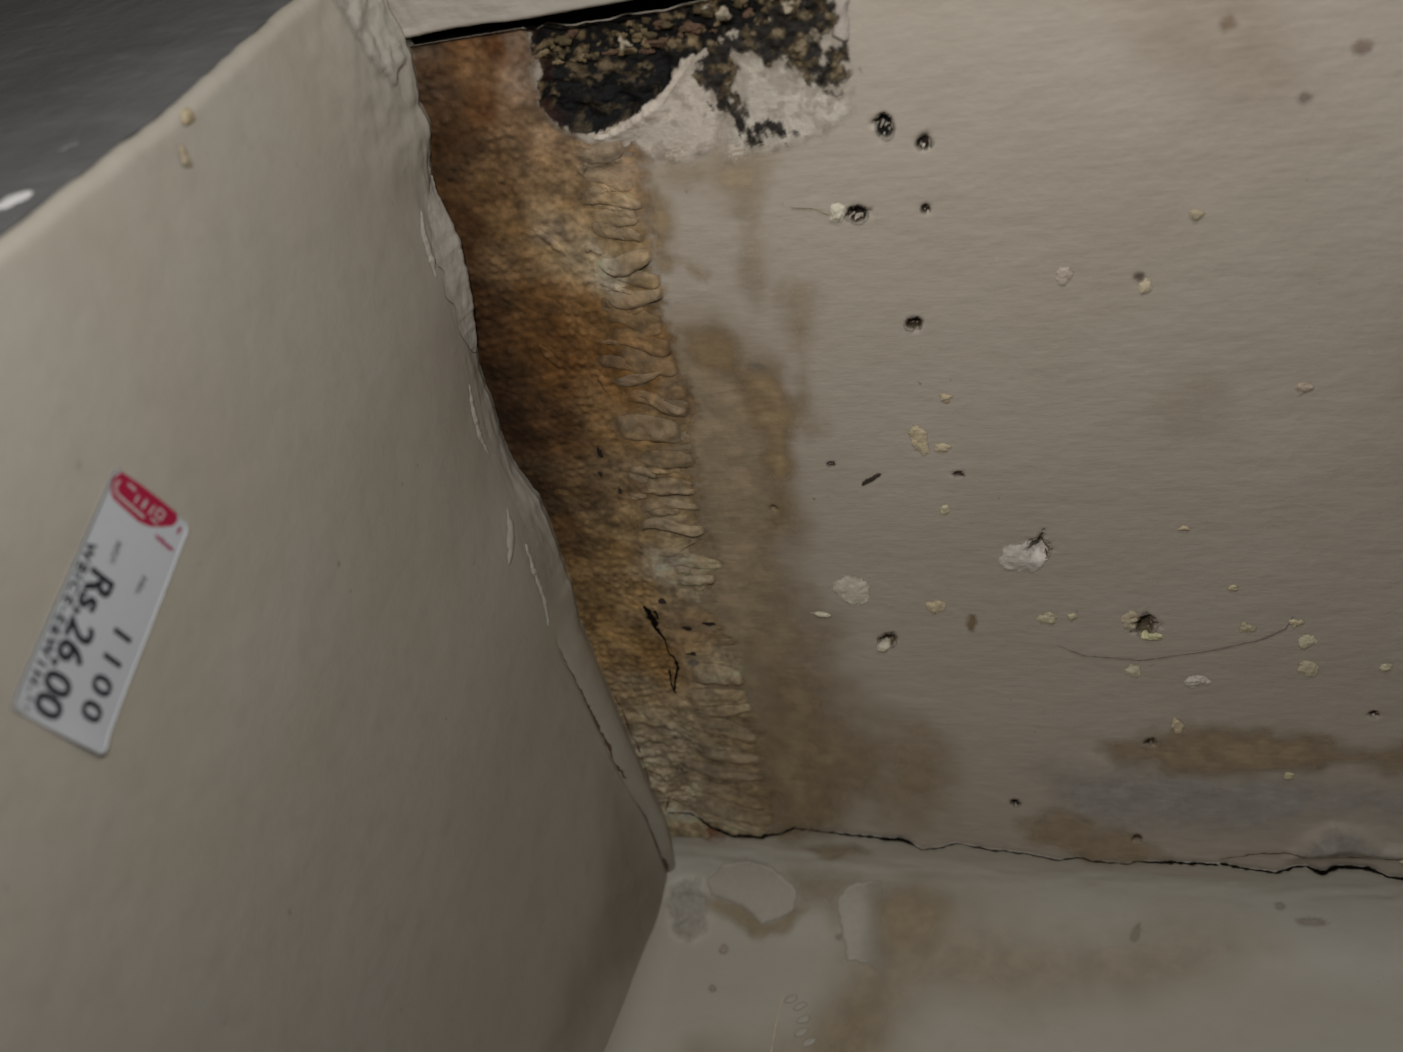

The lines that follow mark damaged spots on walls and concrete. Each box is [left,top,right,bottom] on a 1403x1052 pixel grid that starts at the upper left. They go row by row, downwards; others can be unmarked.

peeling [410,0,851,839]
leakage [665,329,874,836]
peeling [832,575,870,605]
peeling [998,533,1052,572]
crack [643,605,680,693]
crack [560,650,1403,881]
leakage [1112,730,1403,774]
peeling [707,861,797,924]
leakage [709,901,797,935]